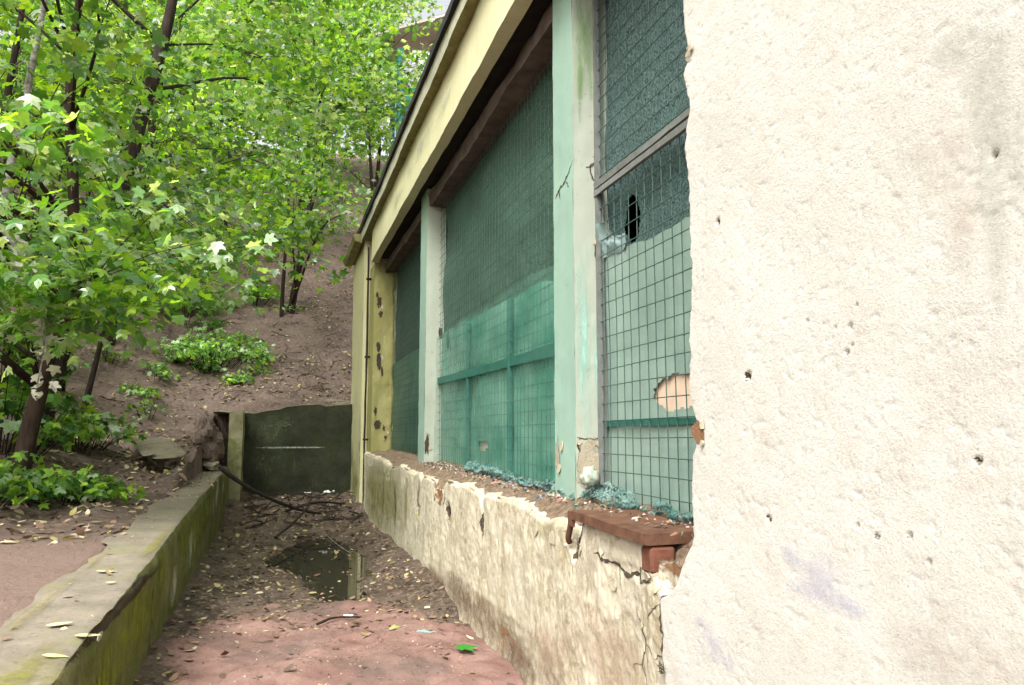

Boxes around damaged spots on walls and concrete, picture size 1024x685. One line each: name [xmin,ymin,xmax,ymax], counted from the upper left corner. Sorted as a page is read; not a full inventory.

crack [555,156,594,198]
peeling [376,342,384,376]
spalling [691,420,704,446]
spalling [555,435,563,473]
spalling [576,437,599,488]
spalling [434,488,451,519]
crack [594,552,670,685]